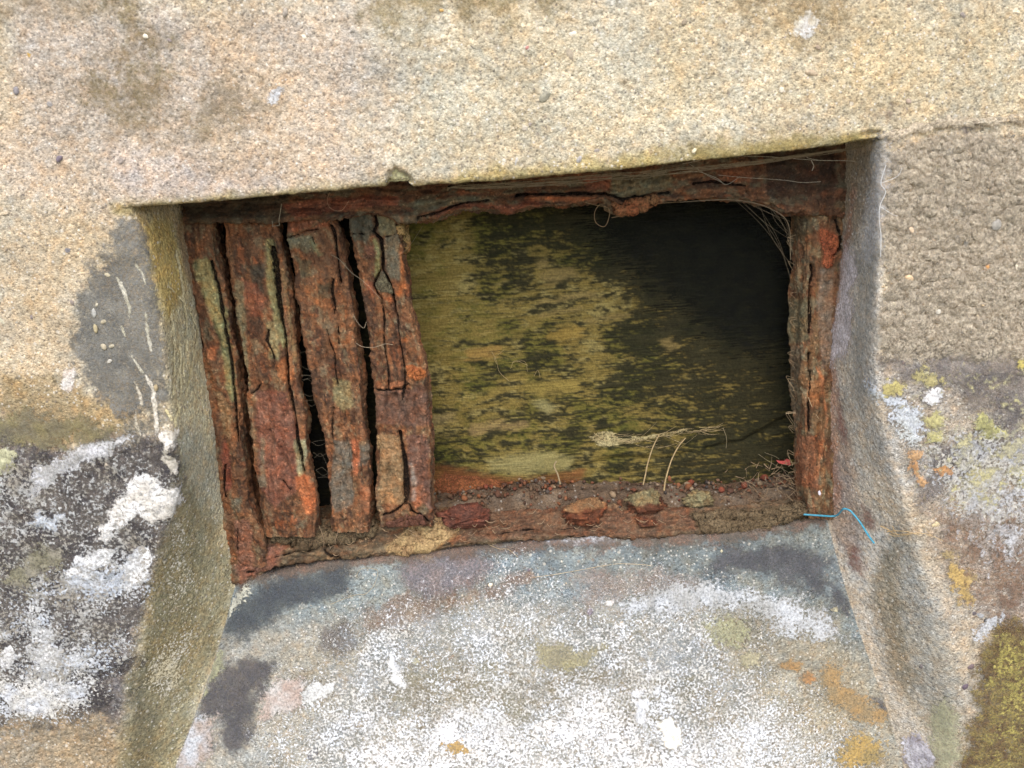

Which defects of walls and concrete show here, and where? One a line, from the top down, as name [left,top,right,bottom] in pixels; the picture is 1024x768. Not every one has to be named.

rust [611,192,659,217]
rust [820,229,839,268]
water stain [61,218,199,446]
rust [405,364,424,381]
rust [387,515,460,557]
water stain [225,563,349,641]
water stain [319,624,356,654]
water stain [199,658,275,751]